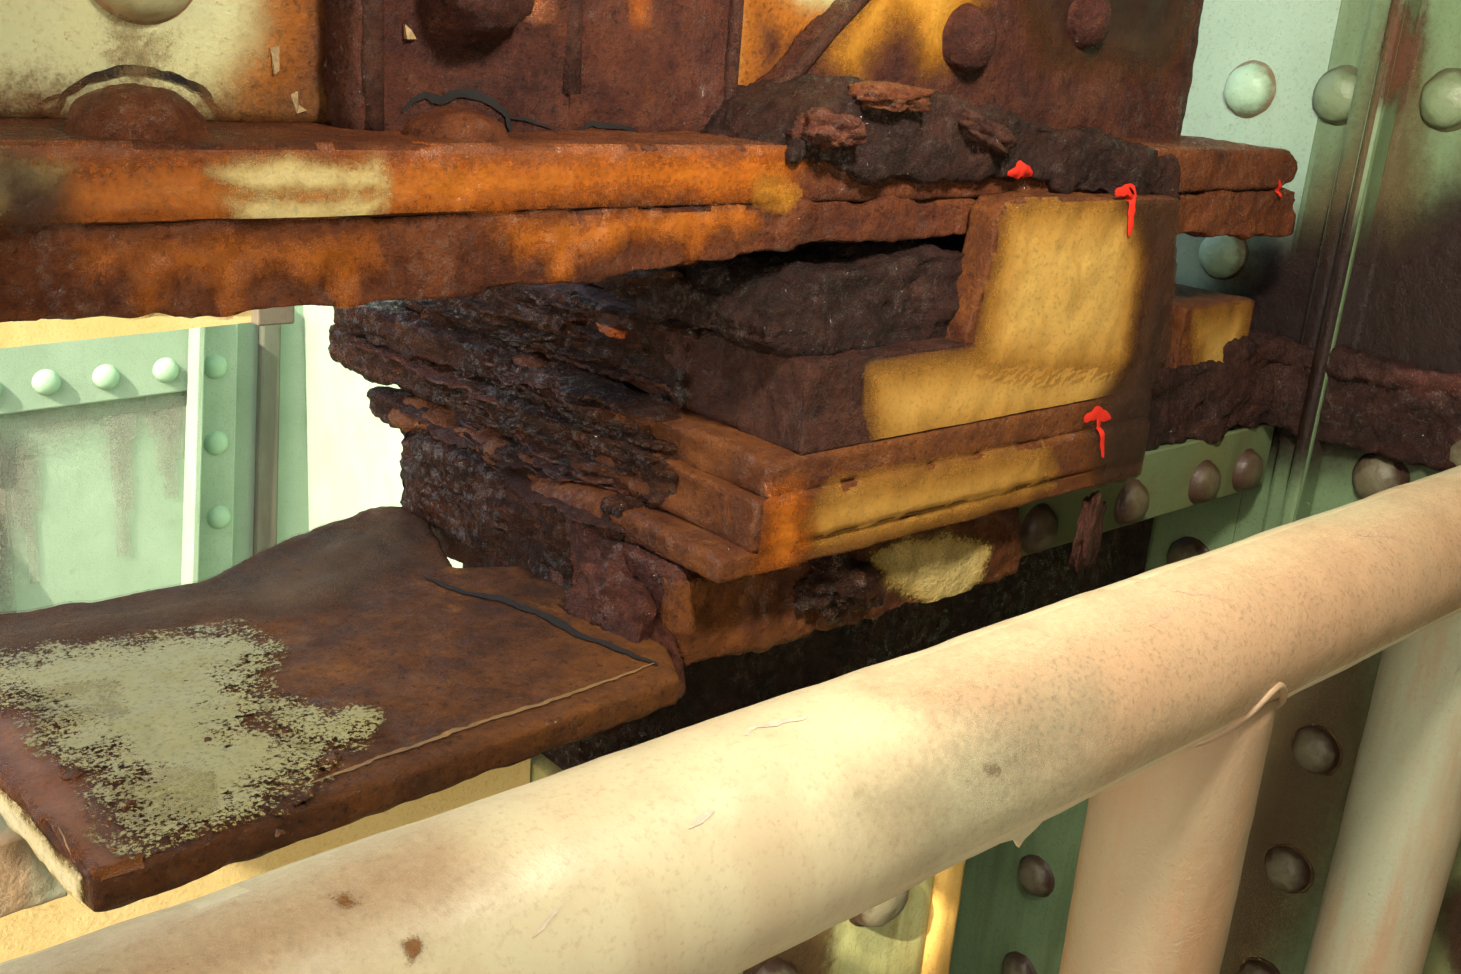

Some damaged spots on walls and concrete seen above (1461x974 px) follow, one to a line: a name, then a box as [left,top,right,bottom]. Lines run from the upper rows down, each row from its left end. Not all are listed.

rust [0,72,82,119]
rust [105,14,172,87]
rust [188,0,328,123]
rust [533,0,548,19]
rust [738,0,830,86]
rust [1216,0,1461,473]
rust [0,140,802,589]
peeling [870,200,1145,439]
peeling [804,451,1052,603]
rust [0,702,157,894]
rust [331,894,358,908]